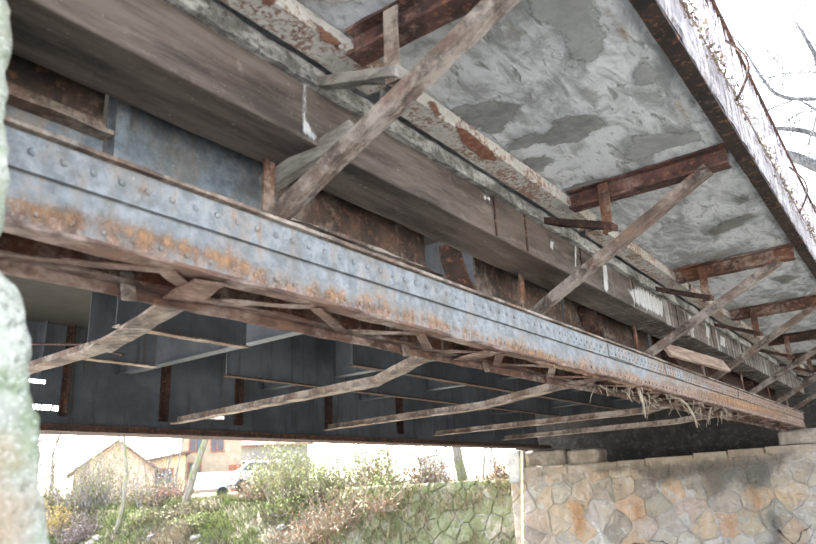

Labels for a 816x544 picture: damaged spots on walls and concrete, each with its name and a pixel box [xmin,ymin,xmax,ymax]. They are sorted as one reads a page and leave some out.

peeling [309,19,342,50]
rust [28,204,232,268]
crack [773,521,812,544]